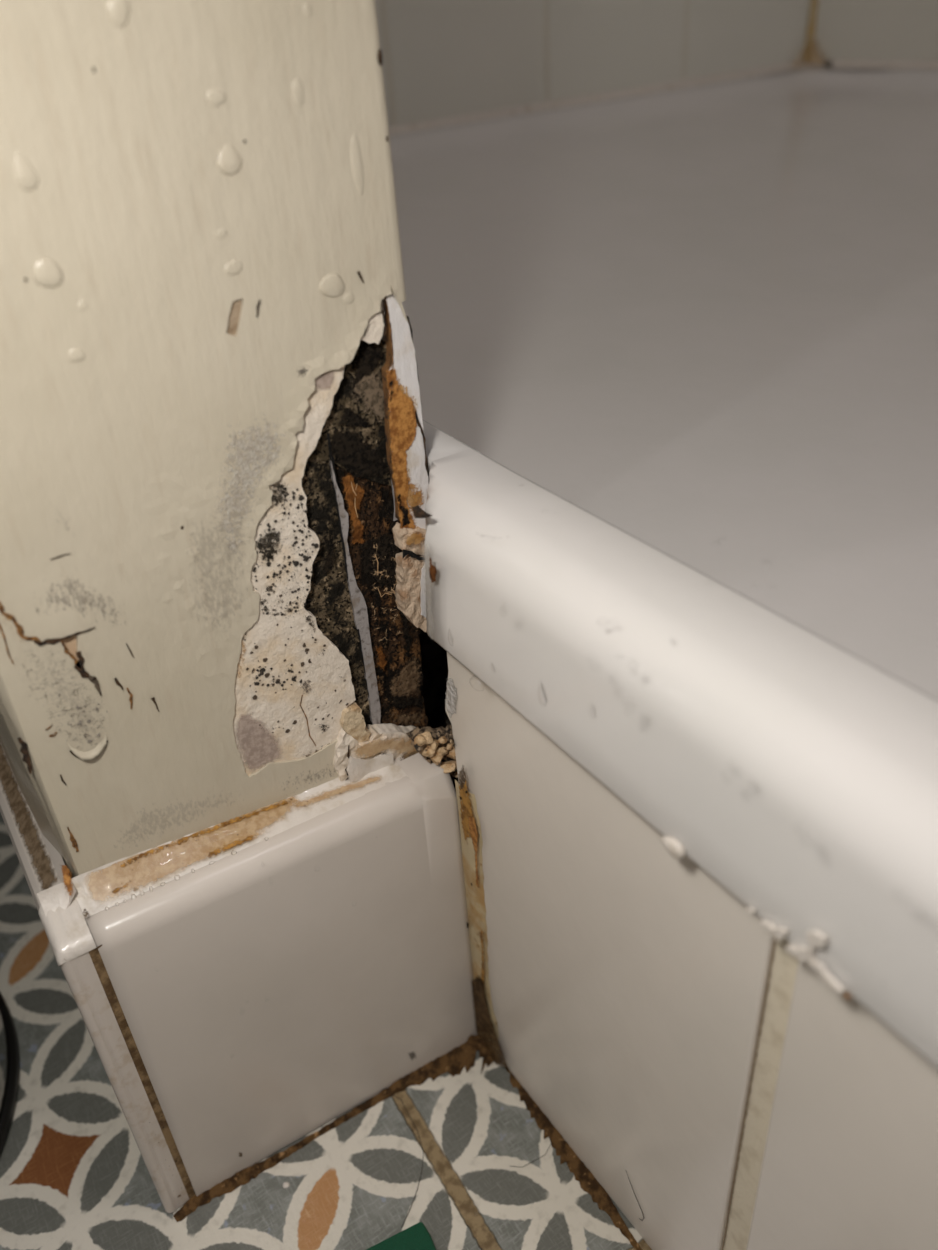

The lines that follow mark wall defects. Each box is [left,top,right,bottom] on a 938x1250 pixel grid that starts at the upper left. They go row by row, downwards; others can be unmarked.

peeling [226,299,242,336]
spalling [233,298,457,783]
leakage [459,780,479,887]